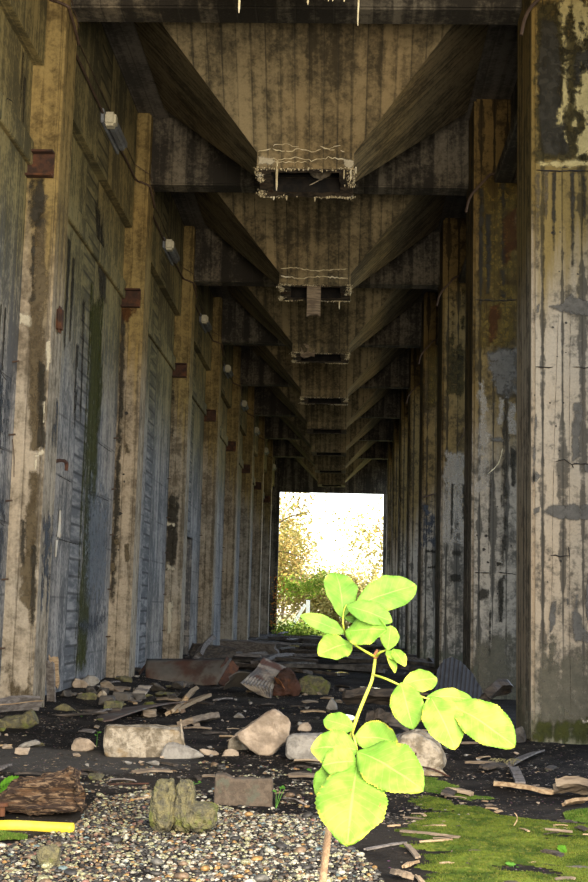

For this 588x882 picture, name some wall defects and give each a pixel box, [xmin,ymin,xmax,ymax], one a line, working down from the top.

peeling [558,0,588,47]
peeling [540,65,588,169]
damp [95,202,104,248]
damp [255,157,357,201]
damp [0,304,12,454]
damp [19,195,58,634]
damp [64,238,130,640]